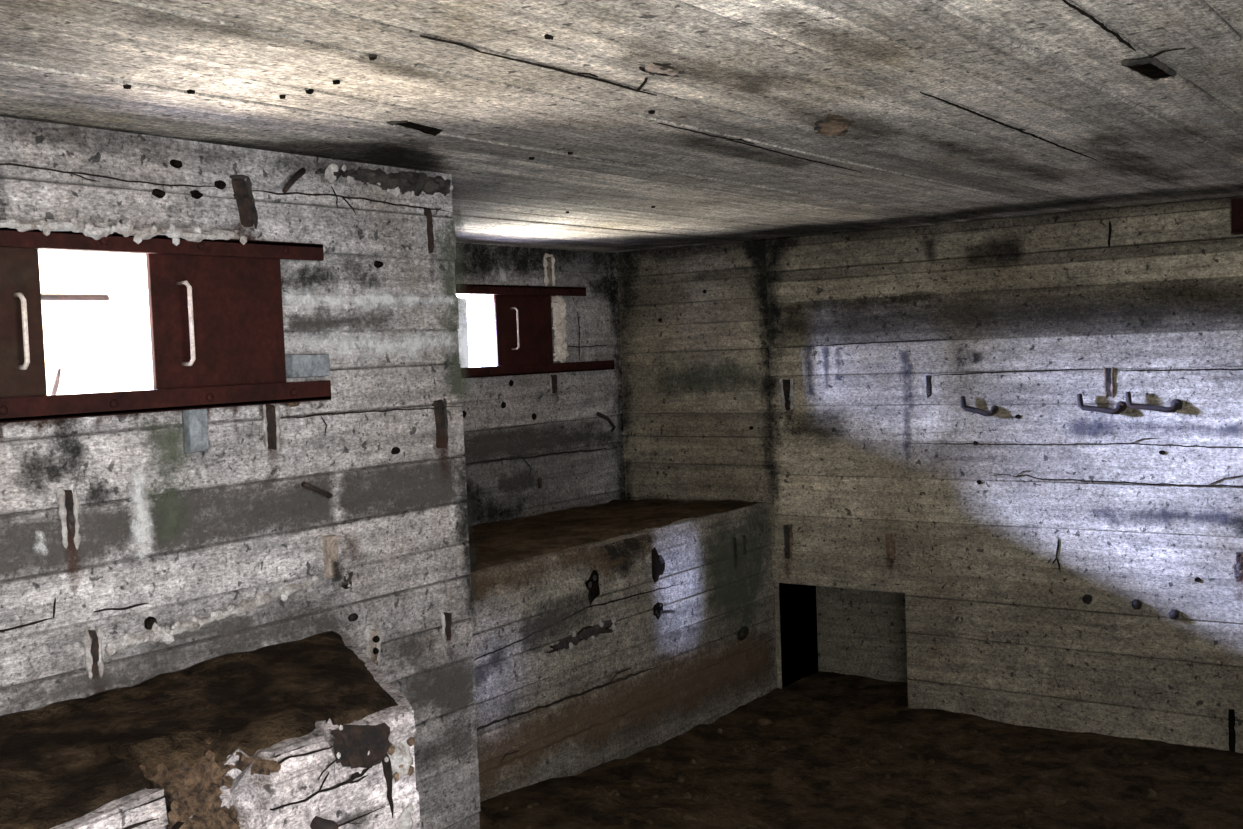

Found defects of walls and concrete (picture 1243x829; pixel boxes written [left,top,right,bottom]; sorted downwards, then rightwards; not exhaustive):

spalling [0,217,247,246]
water stain [0,210,639,627]
spalling [140,750,281,829]
spalling [330,722,415,782]